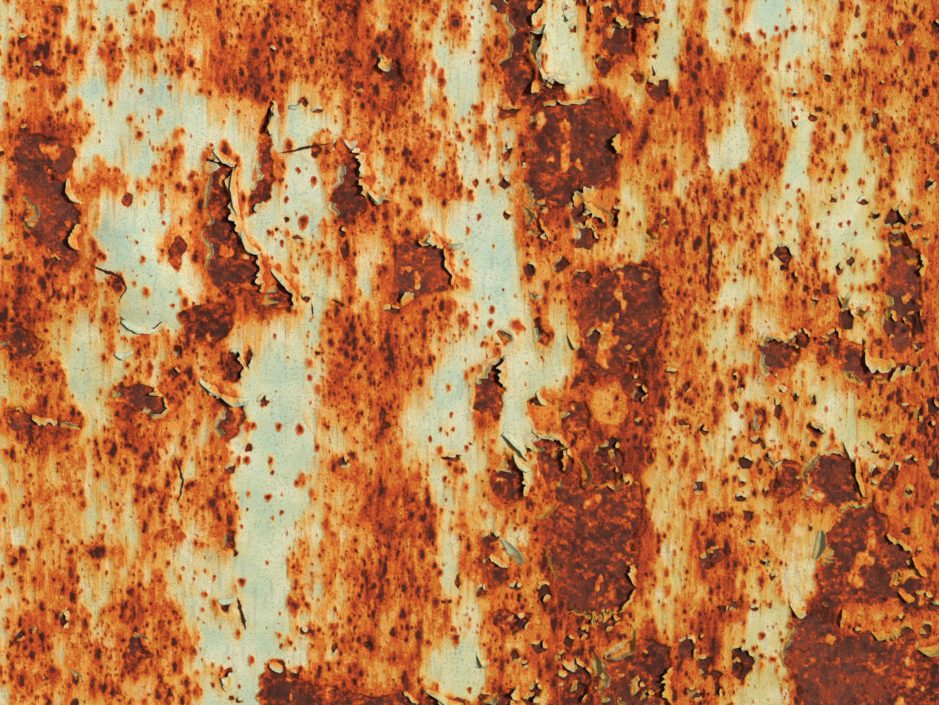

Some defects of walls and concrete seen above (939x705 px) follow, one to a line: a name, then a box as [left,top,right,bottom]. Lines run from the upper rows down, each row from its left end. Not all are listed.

peeling [0,124,83,272]
peeling [178,97,323,345]
peeling [311,139,391,261]
peeling [490,0,624,250]
peeling [199,348,270,441]
rust [0,0,474,705]
peeling [474,330,513,418]
peeling [551,256,668,402]
rust [447,0,939,705]
peeling [476,530,531,636]
peeling [489,390,759,705]
peeling [258,659,542,705]